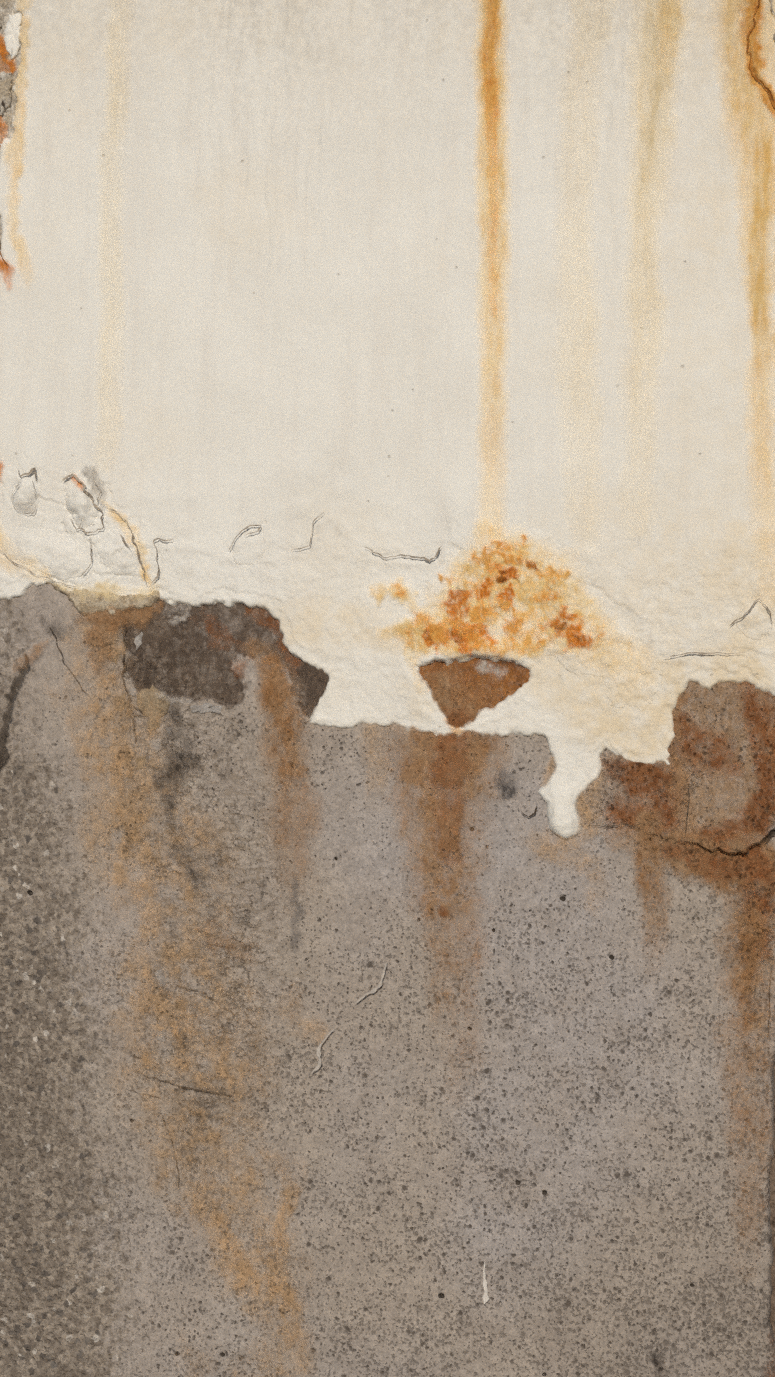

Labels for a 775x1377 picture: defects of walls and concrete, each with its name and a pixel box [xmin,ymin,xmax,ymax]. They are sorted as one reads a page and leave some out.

flaking render [0,0,22,147]
crack [746,0,775,108]
rust [479,0,504,289]
rust [727,0,775,335]
spalling [46,582,329,719]
rust [251,653,305,777]
rust [376,584,408,600]
rust [400,674,495,955]
peeling [419,658,530,713]
rust [395,535,604,657]
spalling [608,681,775,848]